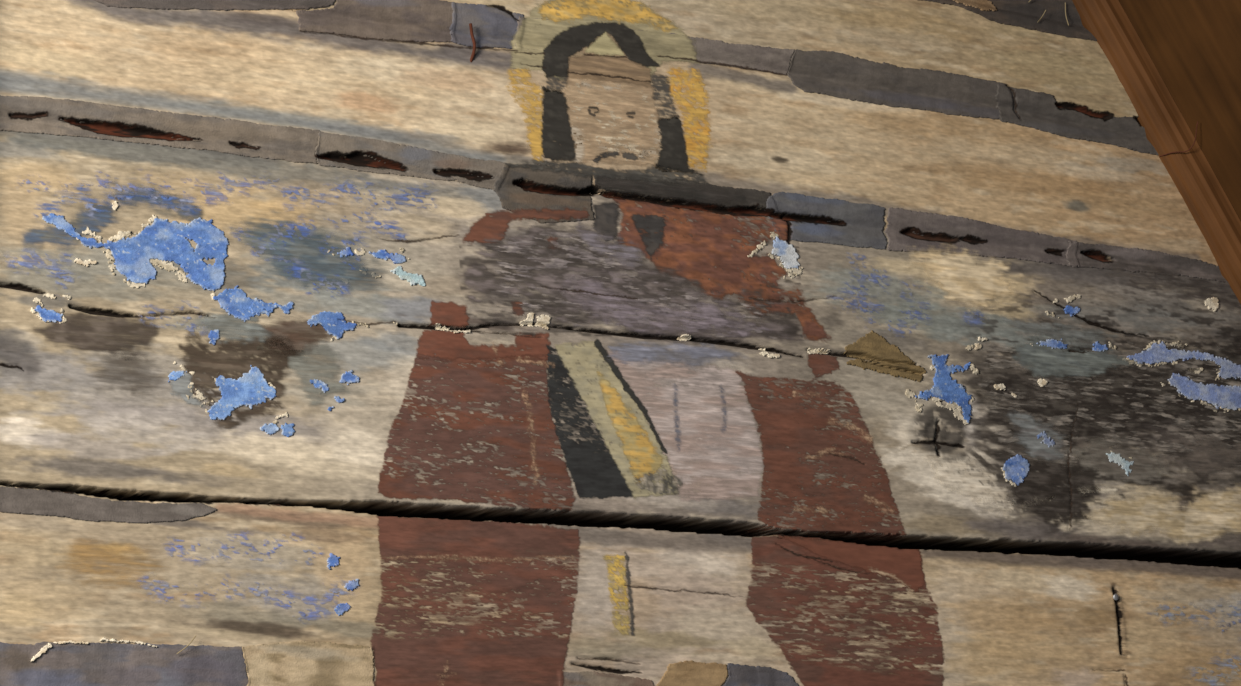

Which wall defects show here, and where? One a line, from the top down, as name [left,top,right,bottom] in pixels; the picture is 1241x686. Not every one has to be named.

crack [0,282,214,318]
peeling [42,213,294,322]
damp [1108,266,1241,308]
peeling [168,361,277,420]
crack [350,321,872,361]
peeling [905,337,988,425]
damp [977,338,1241,445]
peeling [1092,340,1241,413]
crack [6,486,283,506]
peeling [929,454,1030,518]
damp [1011,454,1098,531]
crack [1112,589,1129,686]